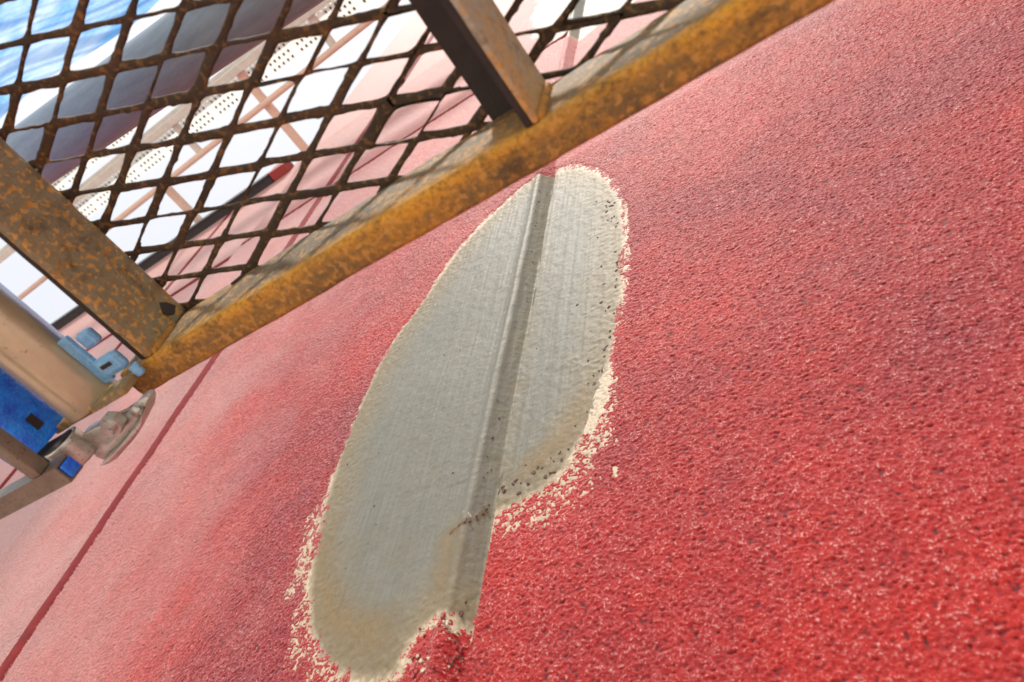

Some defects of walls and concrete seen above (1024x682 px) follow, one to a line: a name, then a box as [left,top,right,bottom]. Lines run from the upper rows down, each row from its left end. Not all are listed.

peeling [283,163,631,682]